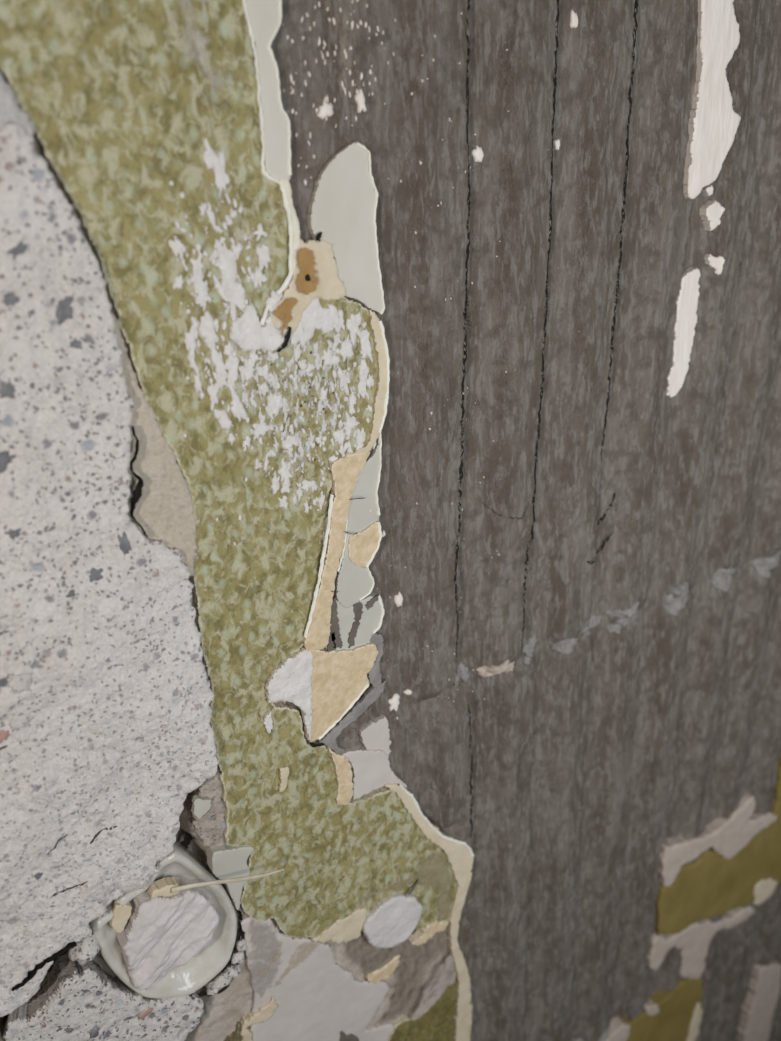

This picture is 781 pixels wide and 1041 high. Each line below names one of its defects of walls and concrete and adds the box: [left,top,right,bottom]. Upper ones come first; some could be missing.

peeling [683,0,741,231]
leakage [168,137,376,545]
rust [274,248,319,337]
peeling [666,254,725,398]
peeling [185,0,474,1041]
peeling [109,899,132,933]
peeling [647,906,755,979]
peeling [736,960,781,1041]